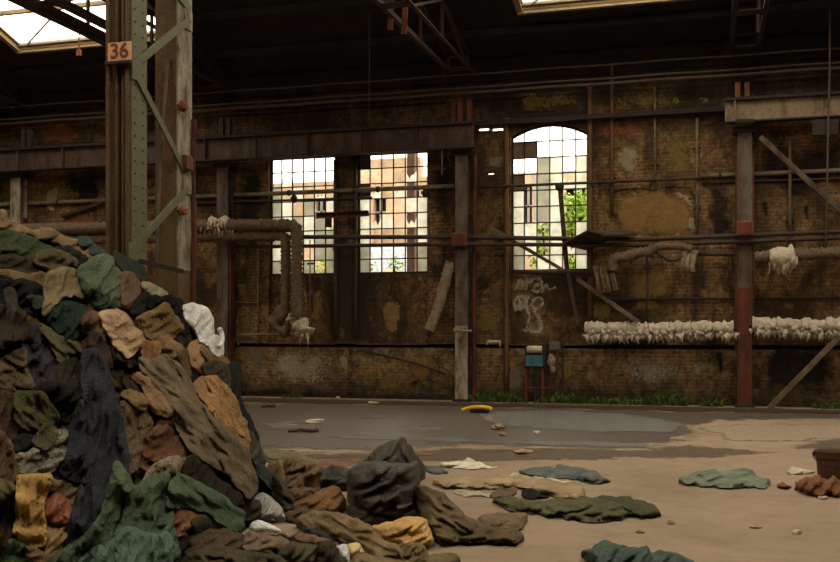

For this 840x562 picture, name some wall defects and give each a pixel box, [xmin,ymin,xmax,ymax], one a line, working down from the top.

peeling [617,147,639,172]
peeling [617,182,695,234]
leakage [709,183,730,240]